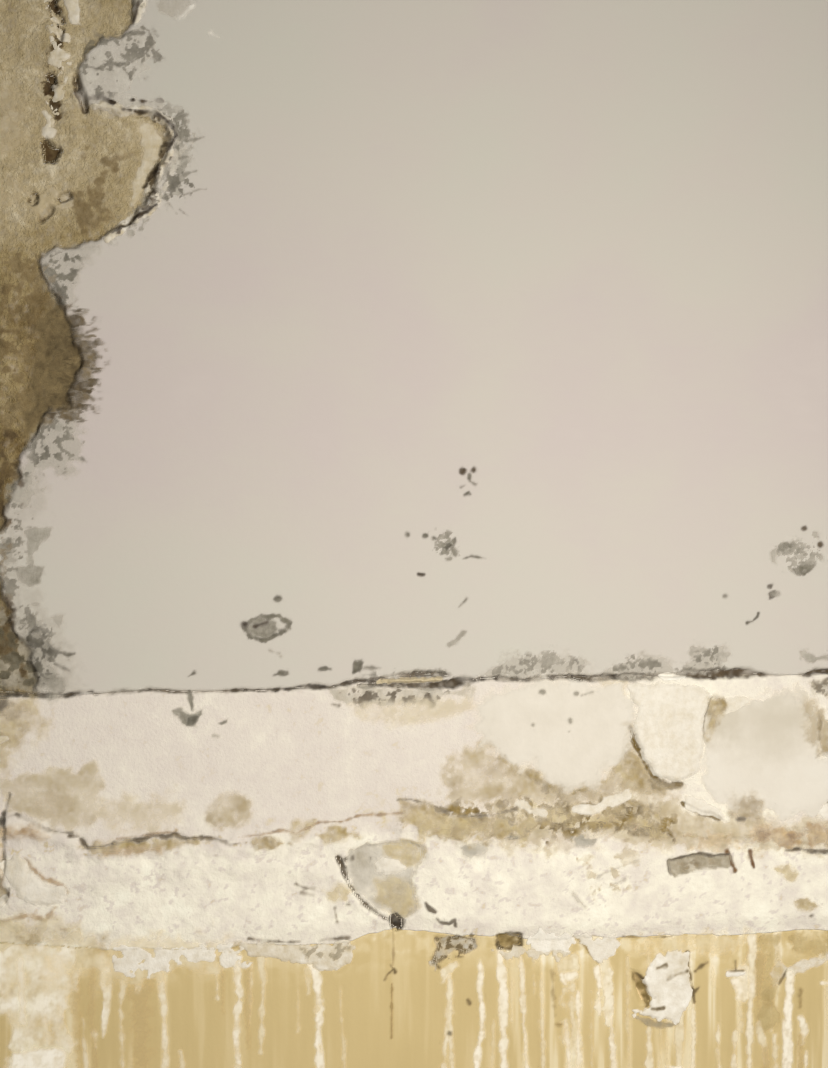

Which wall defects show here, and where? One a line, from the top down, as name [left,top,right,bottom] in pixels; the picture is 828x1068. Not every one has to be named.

spalling [0,0,178,586]
water stain [0,253,102,768]
crack [223,668,765,692]
water stain [0,921,219,1068]
crack [67,832,226,849]
crack [296,855,403,930]
crack [425,903,457,927]
water stain [252,723,828,890]
peeling [492,928,633,963]
spalling [632,950,705,1028]
peeling [627,682,750,821]
water stain [645,933,828,1068]